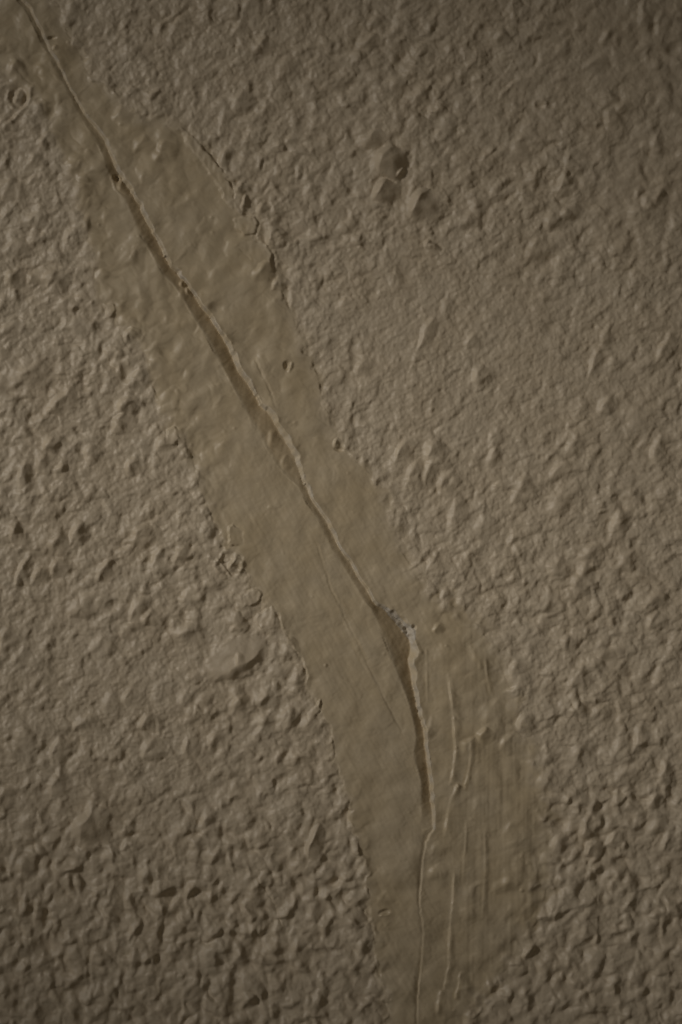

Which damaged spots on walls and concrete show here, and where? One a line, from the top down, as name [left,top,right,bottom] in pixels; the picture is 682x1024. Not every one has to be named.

crack [18,0,436,1024]